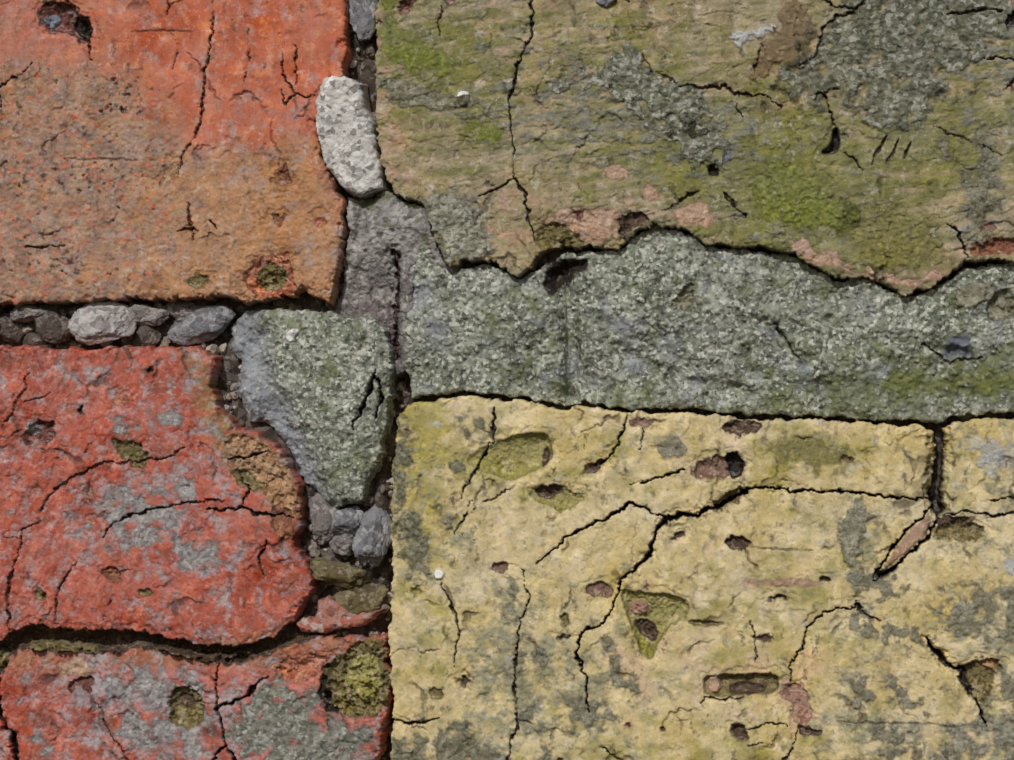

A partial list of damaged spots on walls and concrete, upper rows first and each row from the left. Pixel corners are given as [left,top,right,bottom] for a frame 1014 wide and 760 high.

spalling [37,0,92,44]
crack [799,0,864,67]
crack [178,1,215,175]
crack [479,0,535,242]
crack [642,53,782,115]
crack [391,250,401,360]
crack [352,373,385,430]
crack [595,414,644,465]
spalling [875,515,984,578]
crack [0,443,318,760]
crack [506,429,1014,760]
spalling [957,656,1003,703]